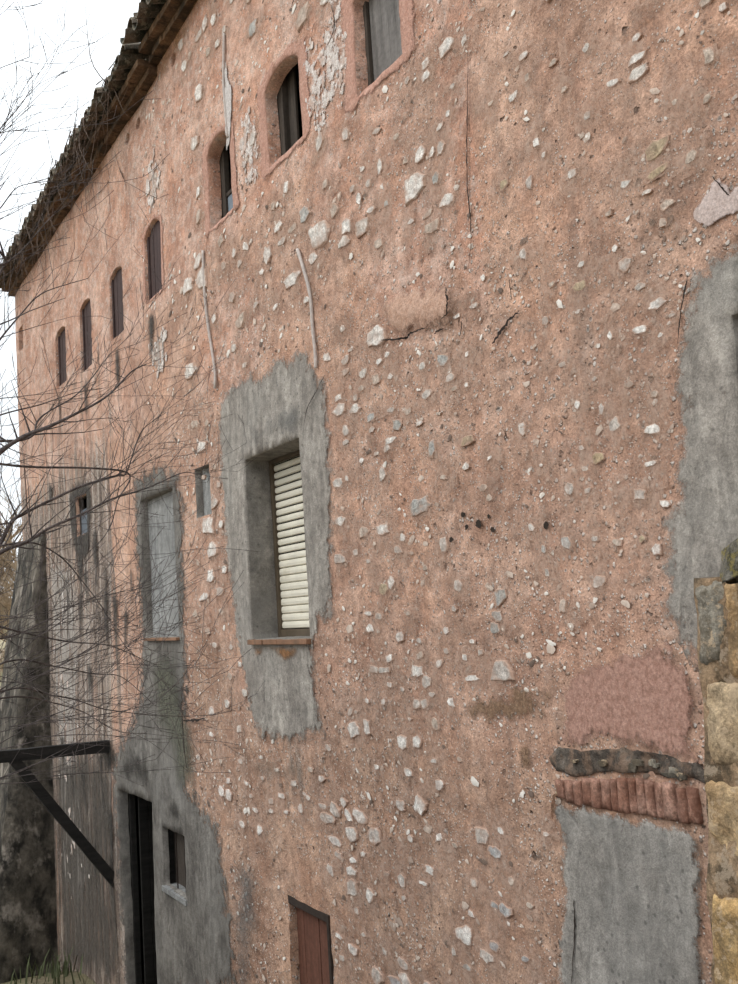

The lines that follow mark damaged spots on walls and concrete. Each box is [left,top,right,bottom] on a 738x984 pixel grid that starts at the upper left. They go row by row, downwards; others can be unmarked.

flaking render [690,0,737,13]
flaking render [575,0,654,140]
flaking render [702,43,730,66]
crack [464,51,472,268]
flaking render [589,84,715,234]
flaking render [693,178,738,226]
crack [383,289,462,341]
crack [492,280,519,344]